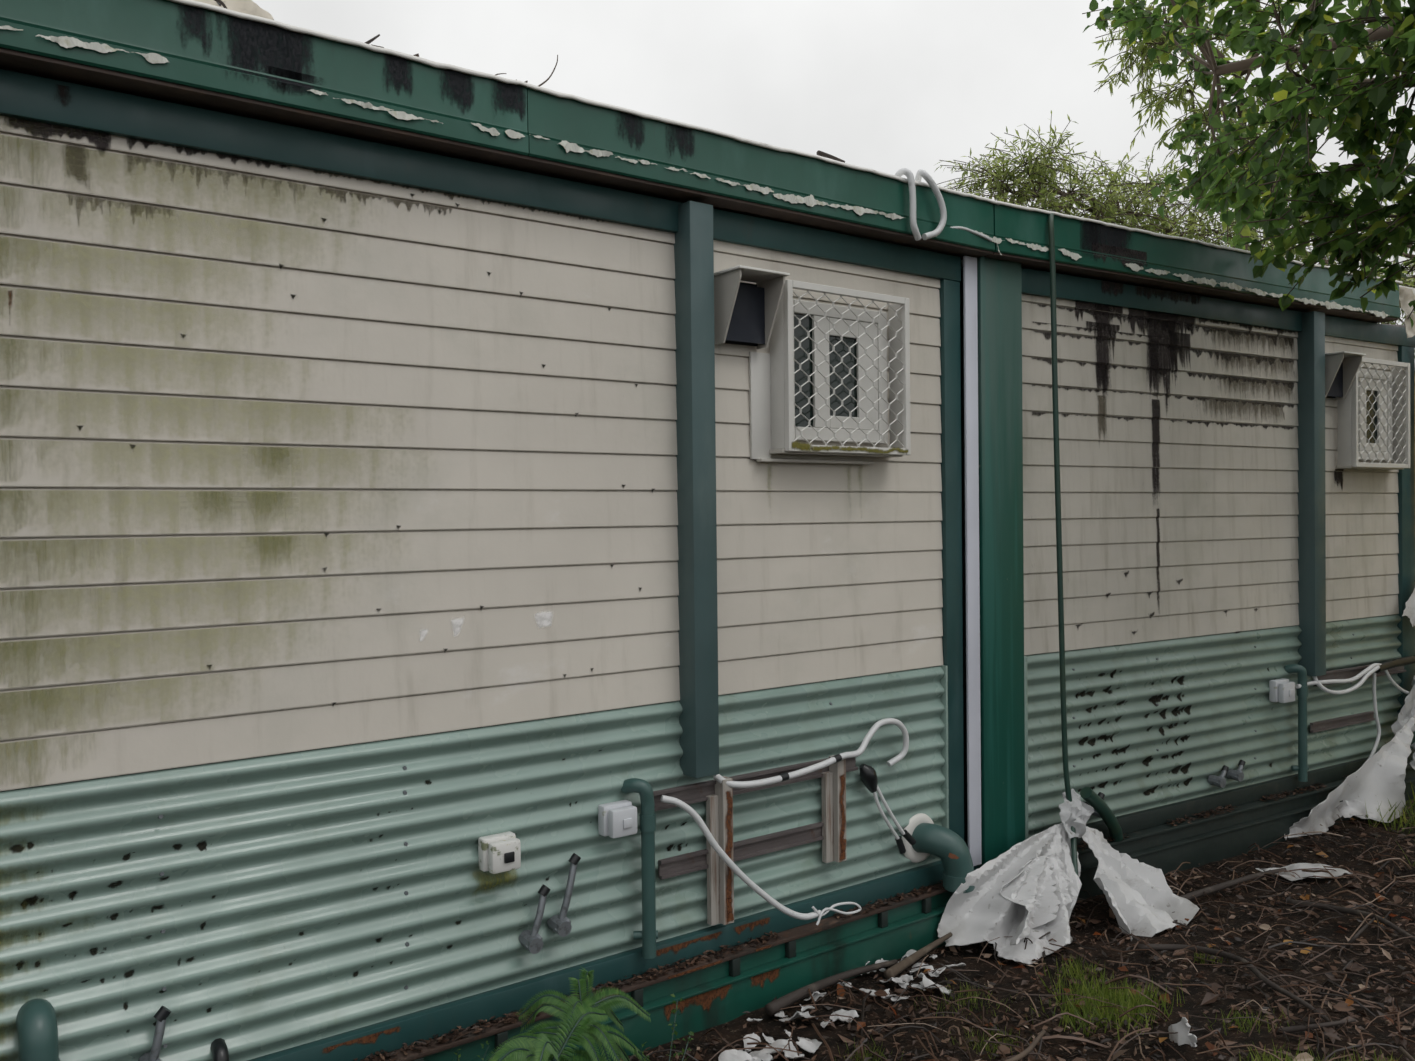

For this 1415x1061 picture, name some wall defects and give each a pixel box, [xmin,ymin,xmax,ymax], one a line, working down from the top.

peeling [0,25,169,64]
water stain [179,4,316,93]
peeling [307,89,443,124]
water stain [383,54,412,93]
water stain [442,69,474,111]
water stain [494,80,525,120]
water stain [620,112,644,147]
water stain [666,124,694,156]
water stain [8,117,602,222]
peeling [470,122,905,220]
water stain [1032,221,1295,616]